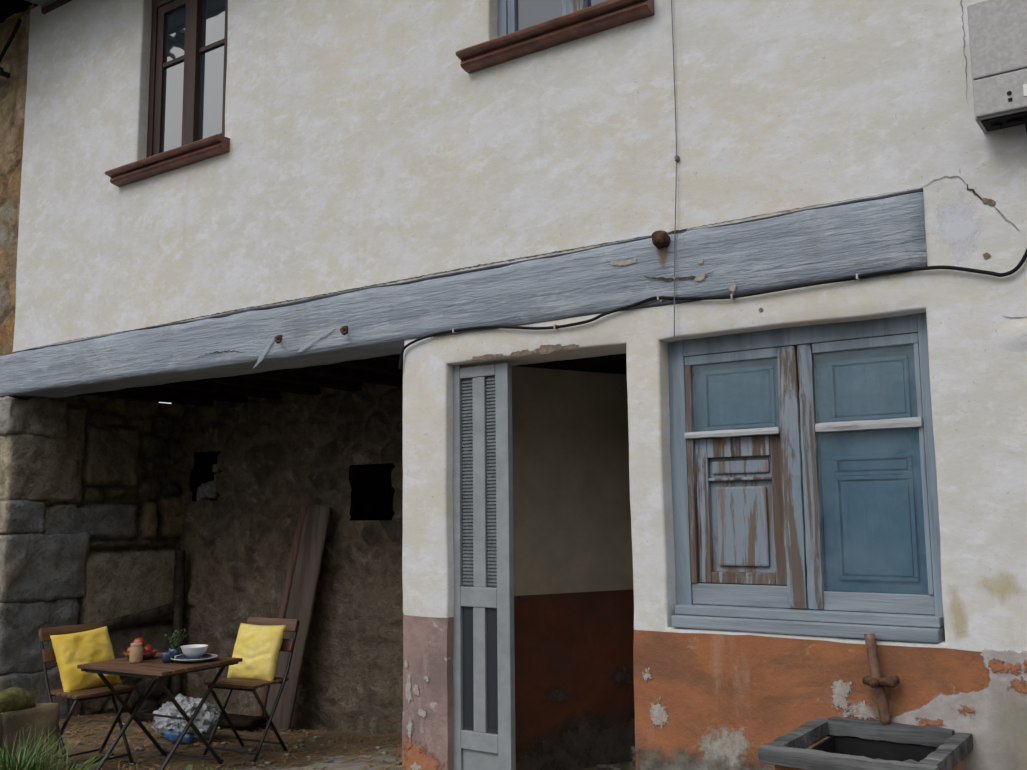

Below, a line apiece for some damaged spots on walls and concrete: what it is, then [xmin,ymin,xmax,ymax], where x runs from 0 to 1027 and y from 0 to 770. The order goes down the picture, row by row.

crack [19,176,1020,351]
spalling [466,344,579,360]
peeling [396,659,446,770]
peeling [649,698,670,728]
water stain [635,728,774,770]
peeling [830,649,1027,770]